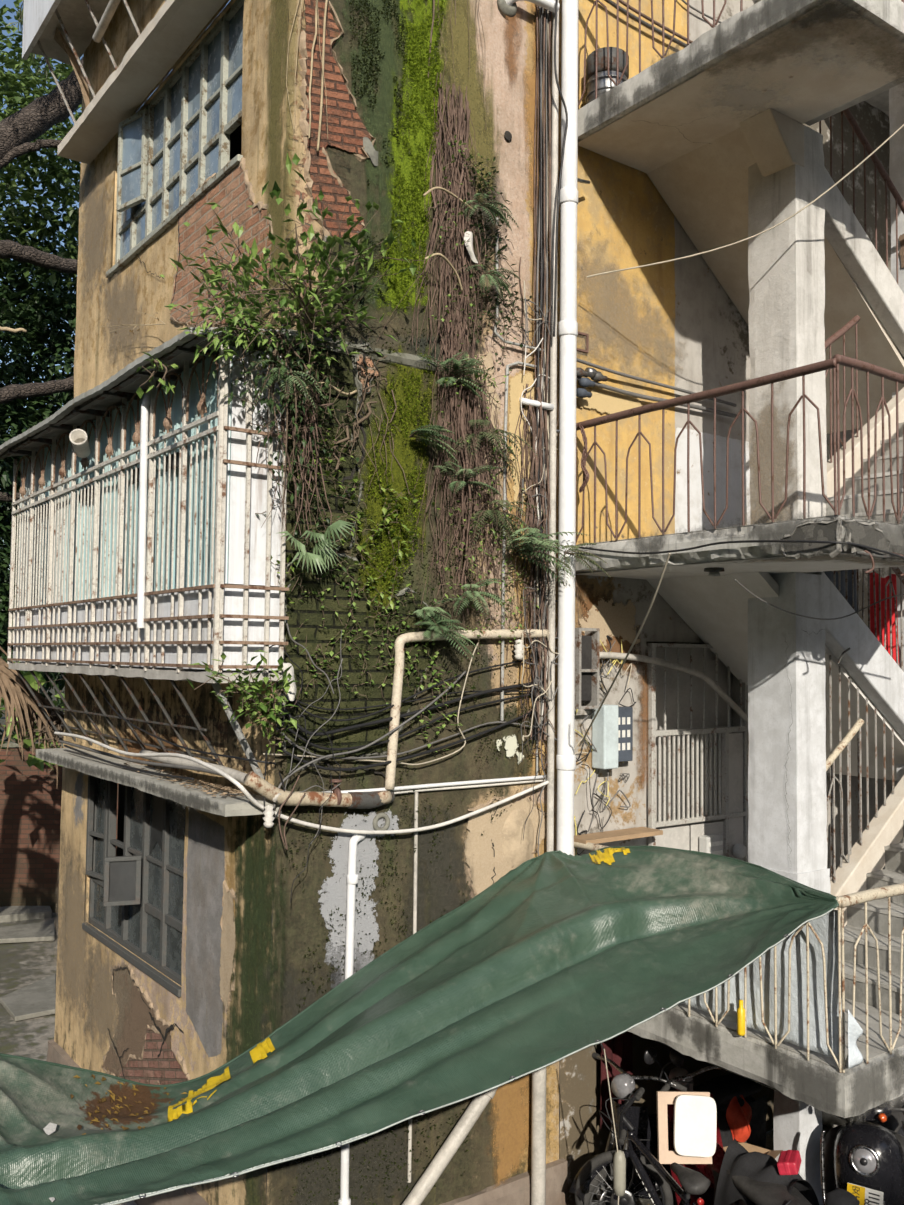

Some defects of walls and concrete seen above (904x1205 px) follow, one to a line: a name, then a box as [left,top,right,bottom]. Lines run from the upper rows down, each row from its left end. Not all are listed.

damp [586,0,904,132]
flaking render [297,0,379,304]
flaking render [170,157,273,328]
spalling [780,517,903,574]
corrosion [577,588,614,635]
corrosion [600,634,648,785]
flaking render [464,793,547,896]
flaking render [101,964,191,1085]
damp [668,1009,720,1058]
damp [770,1047,904,1124]